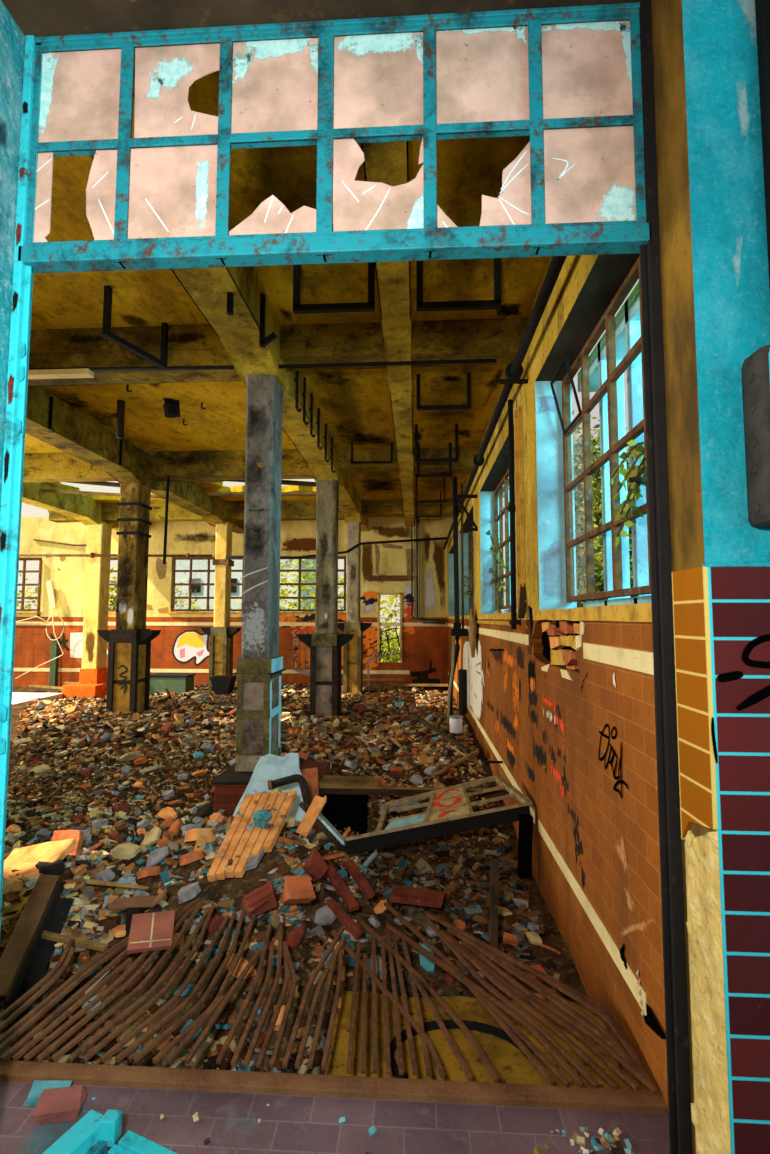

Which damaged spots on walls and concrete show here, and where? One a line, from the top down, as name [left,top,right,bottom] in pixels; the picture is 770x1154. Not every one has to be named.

peeling [8,342,25,405]
spalling [541,621,585,681]